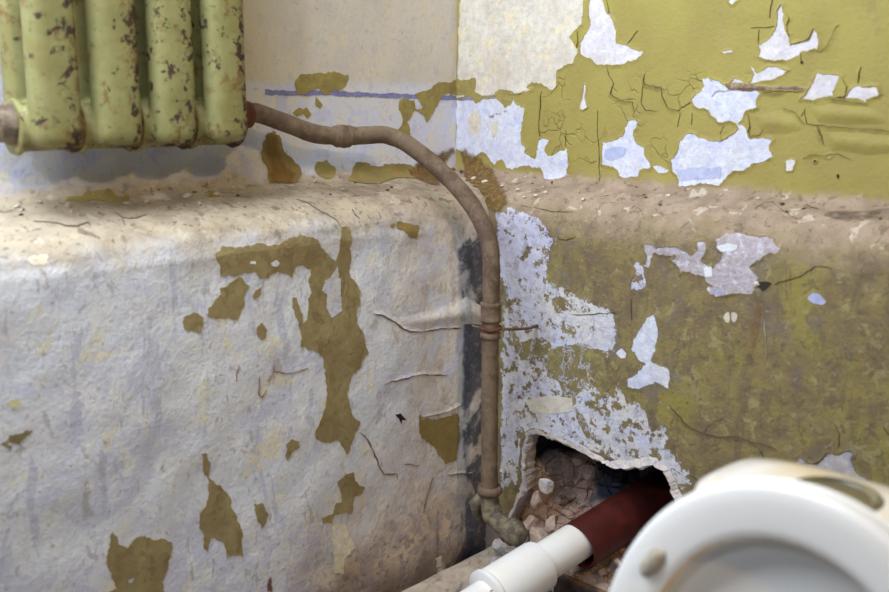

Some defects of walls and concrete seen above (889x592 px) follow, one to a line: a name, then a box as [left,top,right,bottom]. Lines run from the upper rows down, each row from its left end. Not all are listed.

crack [535,91,543,136]
peeling [456,0,645,181]
crack [584,67,701,182]
peeling [599,0,884,189]
crack [720,114,766,139]
crack [761,66,889,164]
peeling [322,267,342,318]
spalling [627,229,785,301]
peeling [805,290,829,307]
spalling [495,206,694,535]
crack [667,405,777,458]
spalling [789,446,879,483]